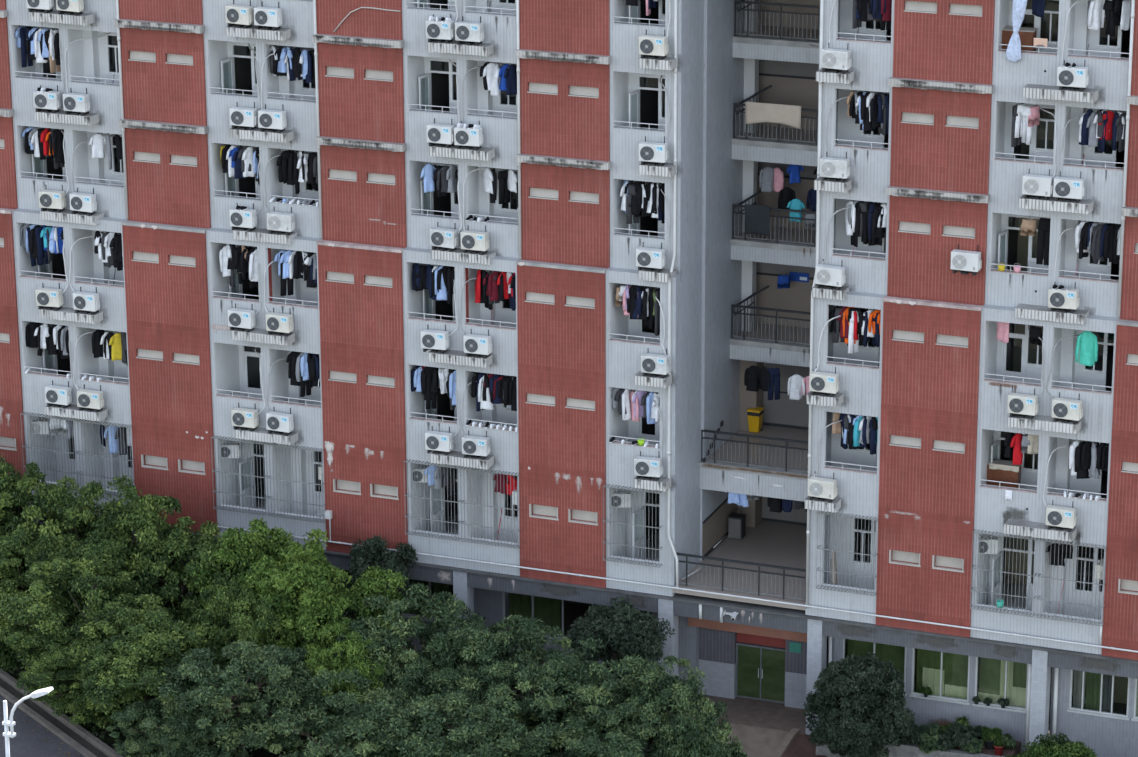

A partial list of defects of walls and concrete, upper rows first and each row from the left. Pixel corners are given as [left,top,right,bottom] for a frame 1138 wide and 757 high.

damp [900,80,974,92]
damp [898,189,980,202]
peeling [325,441,383,465]